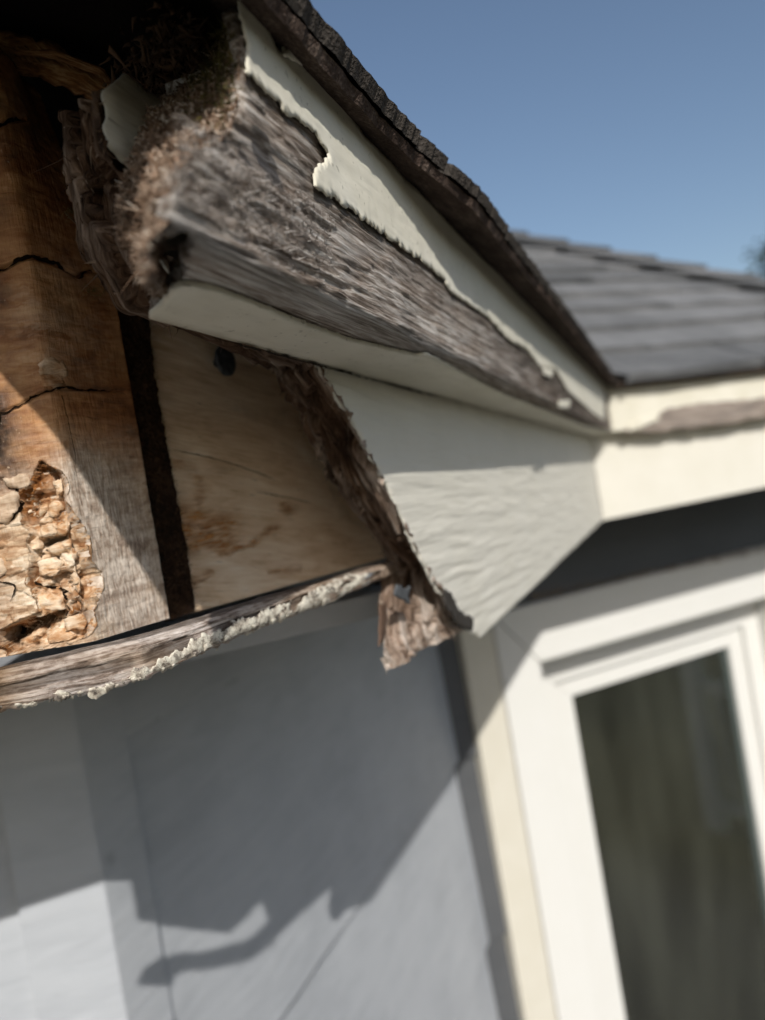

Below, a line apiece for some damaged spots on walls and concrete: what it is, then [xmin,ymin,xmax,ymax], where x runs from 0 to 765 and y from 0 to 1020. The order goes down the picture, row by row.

peeling [149,9,611,431]
crack [0,254,97,279]
peeling [624,397,765,434]
peeling [0,473,31,524]
peeling [30,479,80,586]
peeling [35,592,87,643]
peeling [49,572,375,705]
peeling [378,584,411,647]
peeling [442,589,473,631]